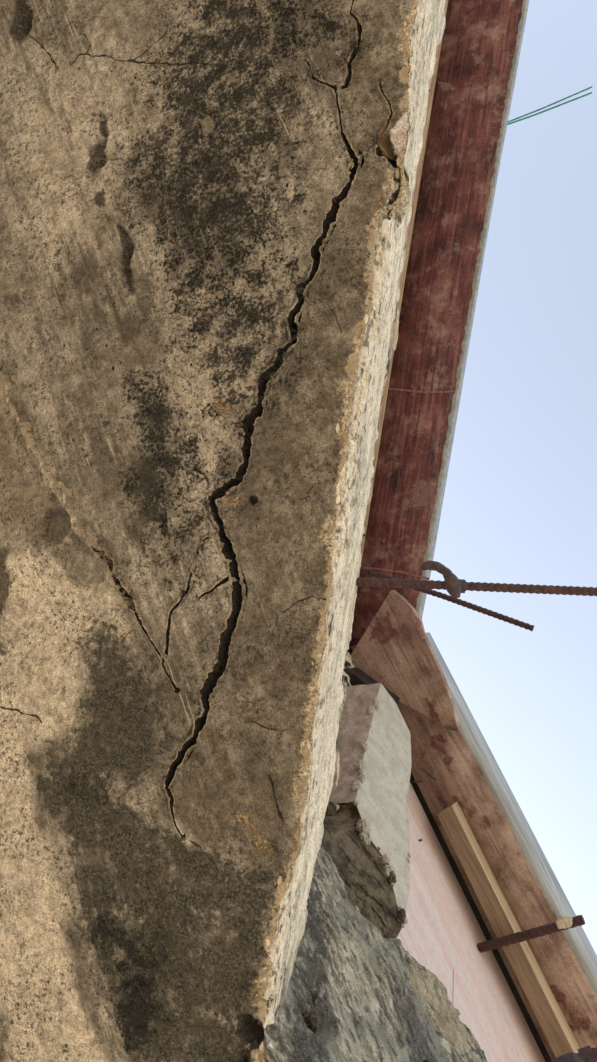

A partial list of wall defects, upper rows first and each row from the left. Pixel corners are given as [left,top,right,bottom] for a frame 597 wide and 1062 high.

crack [27,32,244,73]
damp [109,0,380,604]
crack [90,0,406,876]
spalling [264,0,418,949]
damp [16,610,273,1062]